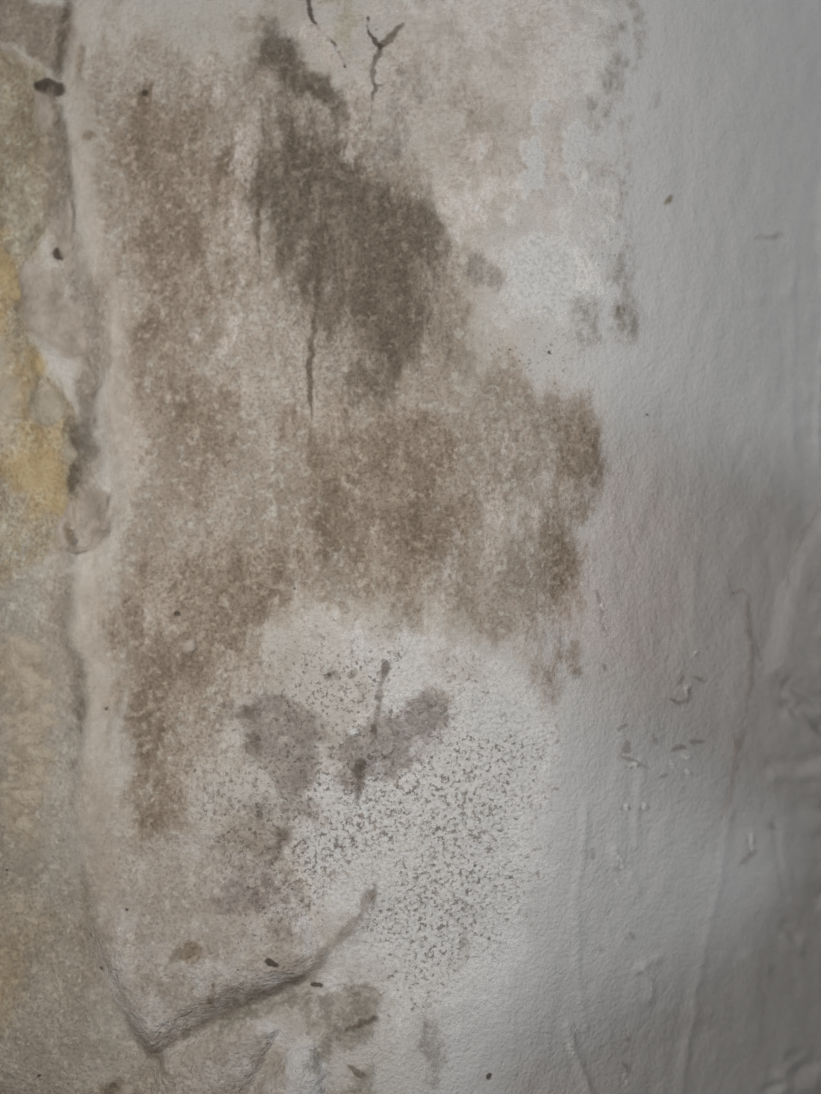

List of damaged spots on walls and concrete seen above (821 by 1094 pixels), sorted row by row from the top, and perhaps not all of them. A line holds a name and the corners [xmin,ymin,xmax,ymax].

peeling [0,41,138,1094]
peeling [131,79,153,118]
leakage [0,0,602,1094]
crack [306,0,404,100]